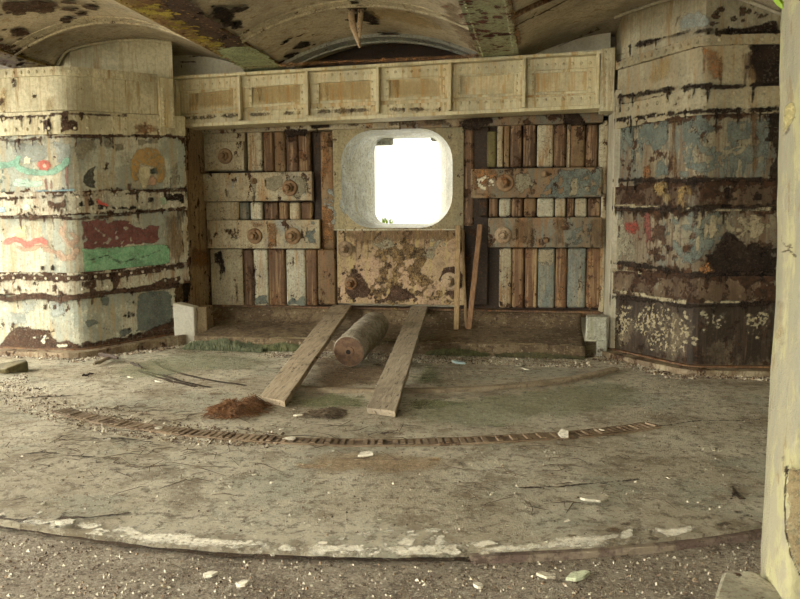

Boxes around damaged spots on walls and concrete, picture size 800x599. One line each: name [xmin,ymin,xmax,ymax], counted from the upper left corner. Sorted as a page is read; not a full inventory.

rust [0,111,186,152]
peeling [540,168,601,199]
peeling [621,121,668,164]
rust [611,44,780,288]
peeling [679,115,770,181]
rust [0,188,187,229]
rust [0,230,225,348]
rust [439,266,463,302]
peeling [613,290,739,352]
peeling [746,312,769,339]
spalling [786,468,800,572]